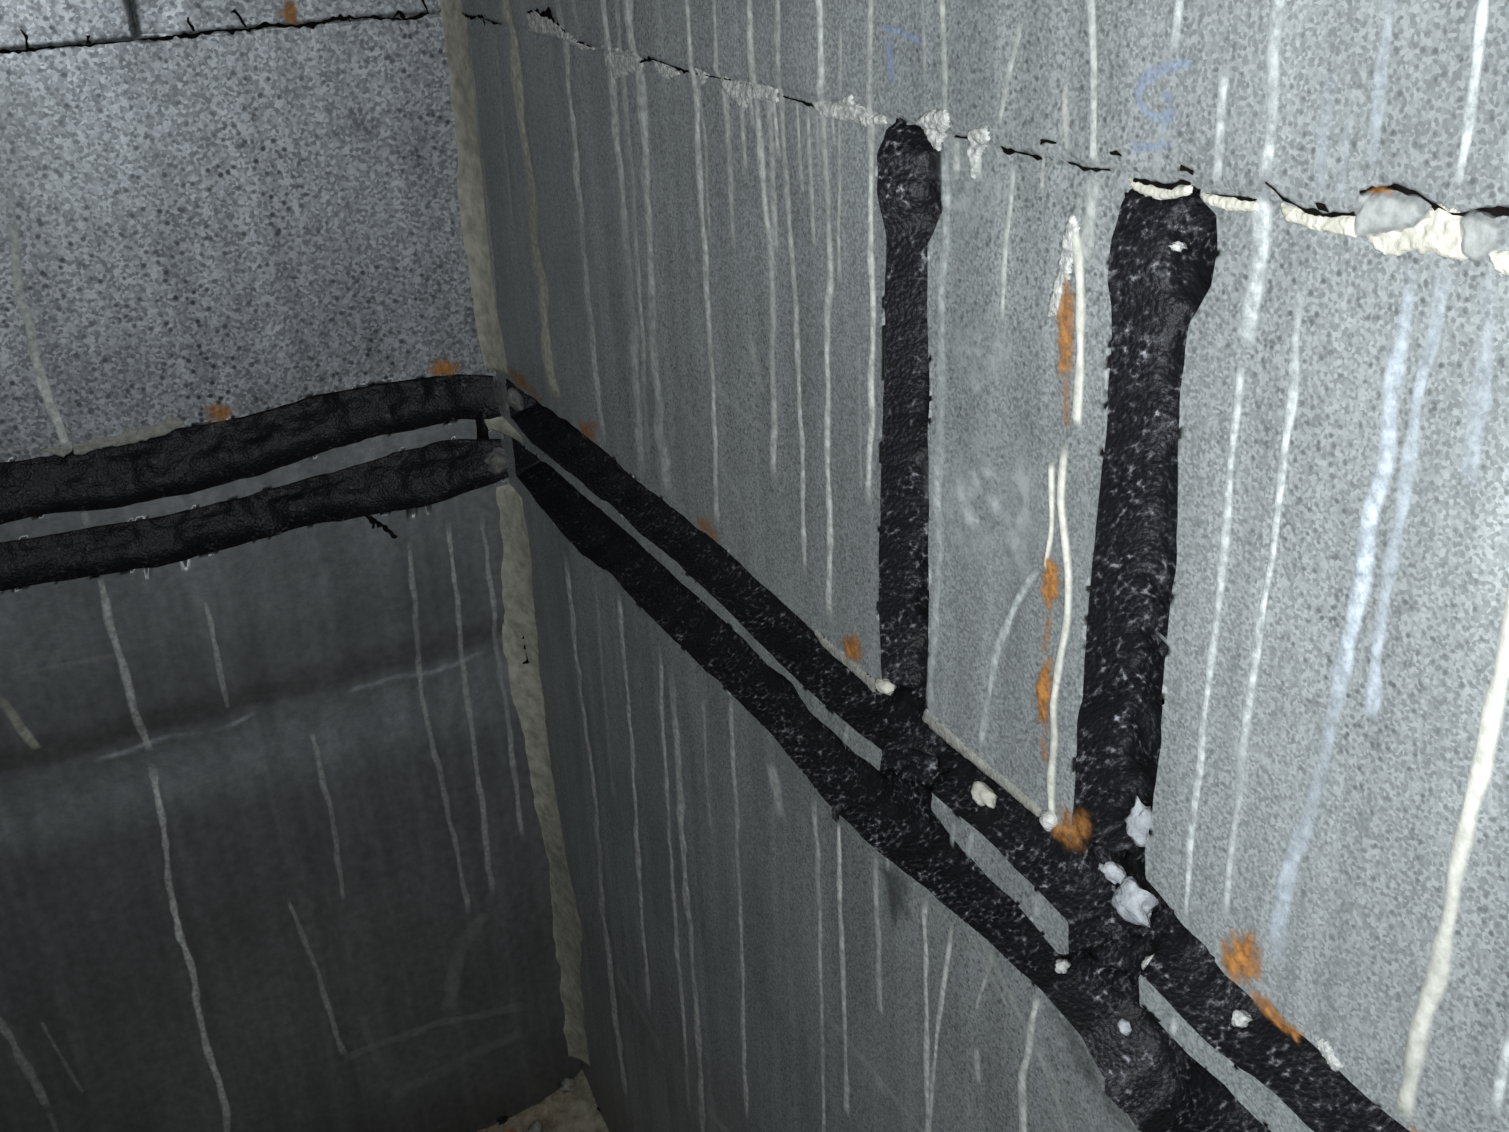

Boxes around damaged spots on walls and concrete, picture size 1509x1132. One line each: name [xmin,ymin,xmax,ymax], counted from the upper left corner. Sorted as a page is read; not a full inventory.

crack [0,0,591,54]
crack [640,56,741,84]
crack [783,96,814,107]
crack [954,135,1509,218]
leakage [712,0,841,611]
leakage [865,84,876,497]
rust [1058,285,1072,372]
leakage [1238,199,1271,340]
rust [1041,559,1057,609]
leakage [1184,370,1243,912]
rust [1036,661,1050,724]
rust [1222,936,1299,1041]